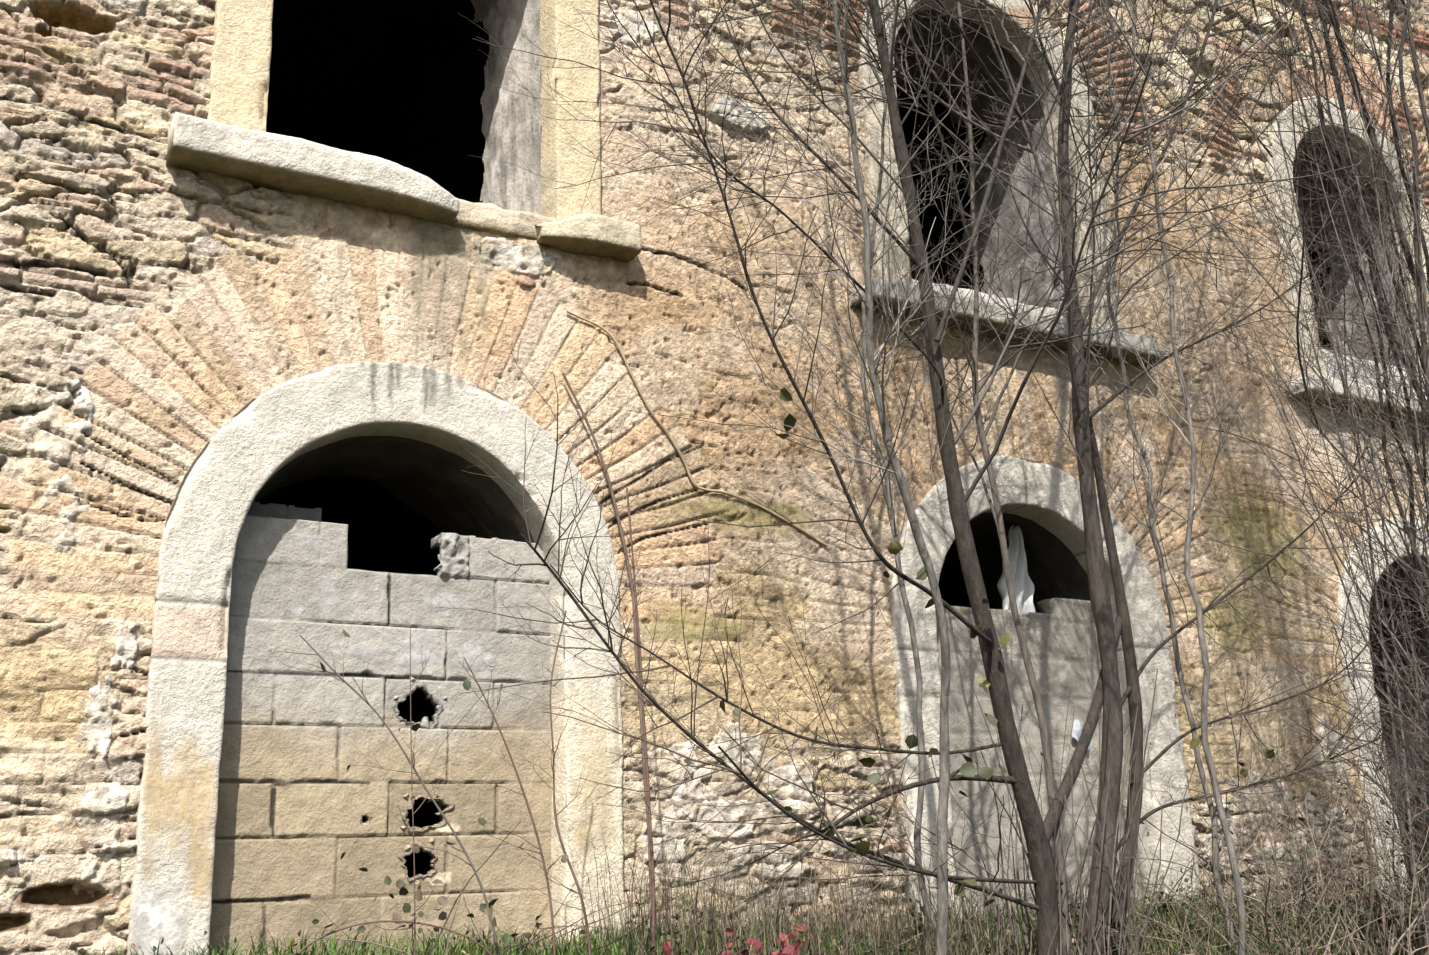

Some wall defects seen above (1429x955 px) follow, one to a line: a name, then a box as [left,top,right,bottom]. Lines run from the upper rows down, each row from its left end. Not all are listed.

spalling [36,0,109,37]
spalling [392,676,448,730]
spalling [396,792,461,888]
spalling [0,884,113,931]